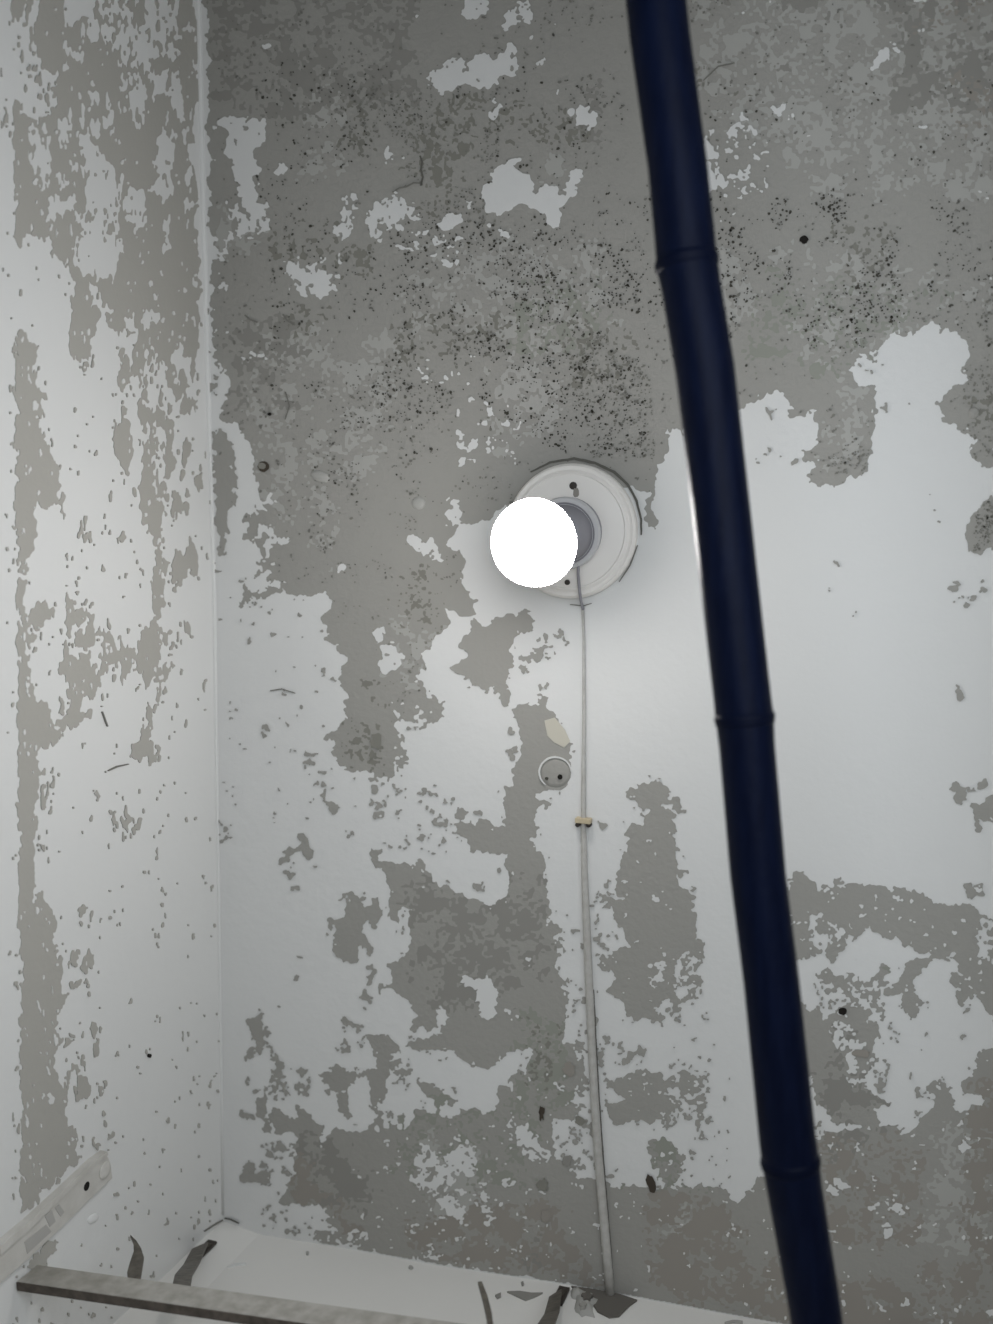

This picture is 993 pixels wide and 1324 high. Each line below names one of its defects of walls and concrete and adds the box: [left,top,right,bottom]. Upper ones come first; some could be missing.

peeling [687,0,993,488]
peeling [1,0,790,1324]
peeling [949,778,993,833]
peeling [965,495,993,555]
peeling [787,871,993,1324]